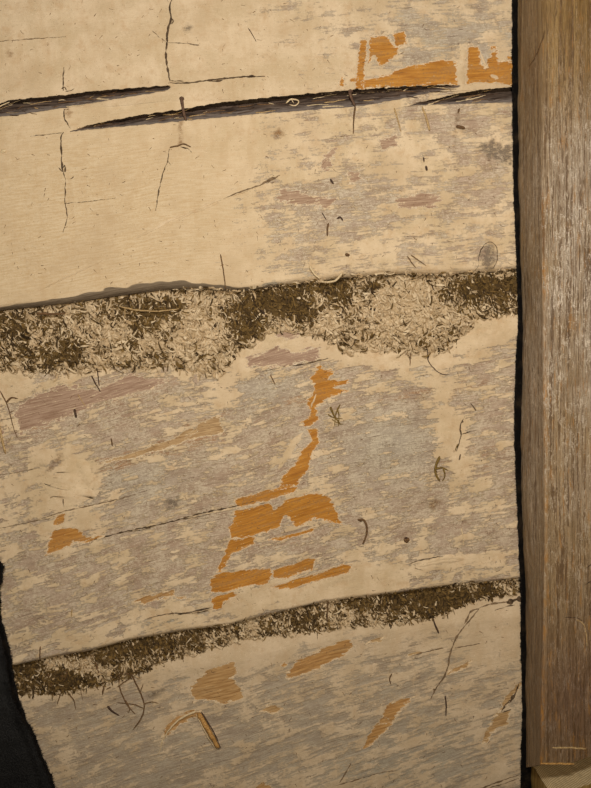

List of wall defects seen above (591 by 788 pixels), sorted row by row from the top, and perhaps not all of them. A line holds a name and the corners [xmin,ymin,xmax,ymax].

peeling [338,31,513,89]
crack [0,0,512,231]
peeling [209,329,353,610]
crack [2,490,147,528]
peeling [44,512,106,556]
crack [90,501,254,541]
peeling [280,637,354,680]
peeling [160,660,244,739]
peeling [362,695,415,749]